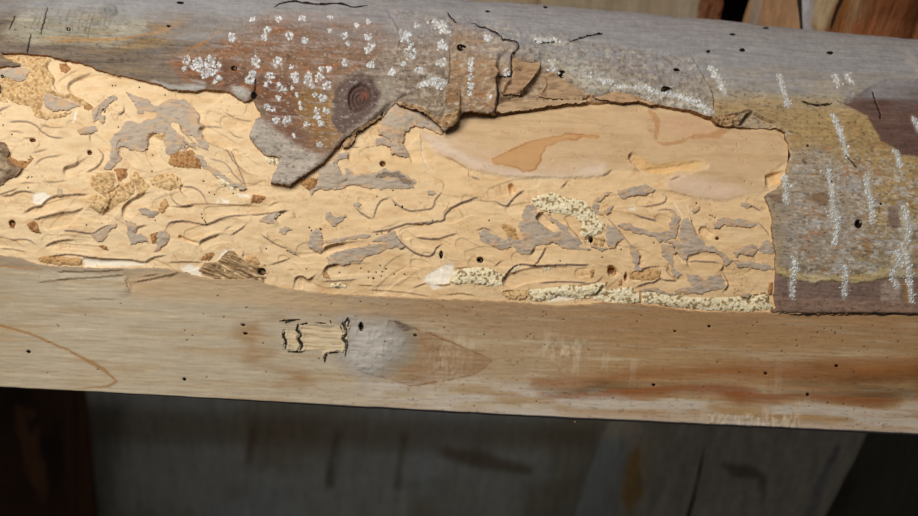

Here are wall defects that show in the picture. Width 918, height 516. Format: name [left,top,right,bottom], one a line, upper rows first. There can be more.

crack [9,8,48,54]
crack [275,0,368,8]
peeling [495,54,656,116]
peeling [77,92,247,191]
peeling [309,104,443,195]
water stain [830,113,851,159]
peeling [91,207,169,252]
peeling [478,184,918,315]
water stain [789,256,799,301]
water stain [820,169,841,246]
water stain [863,174,876,225]
water stain [889,203,916,290]